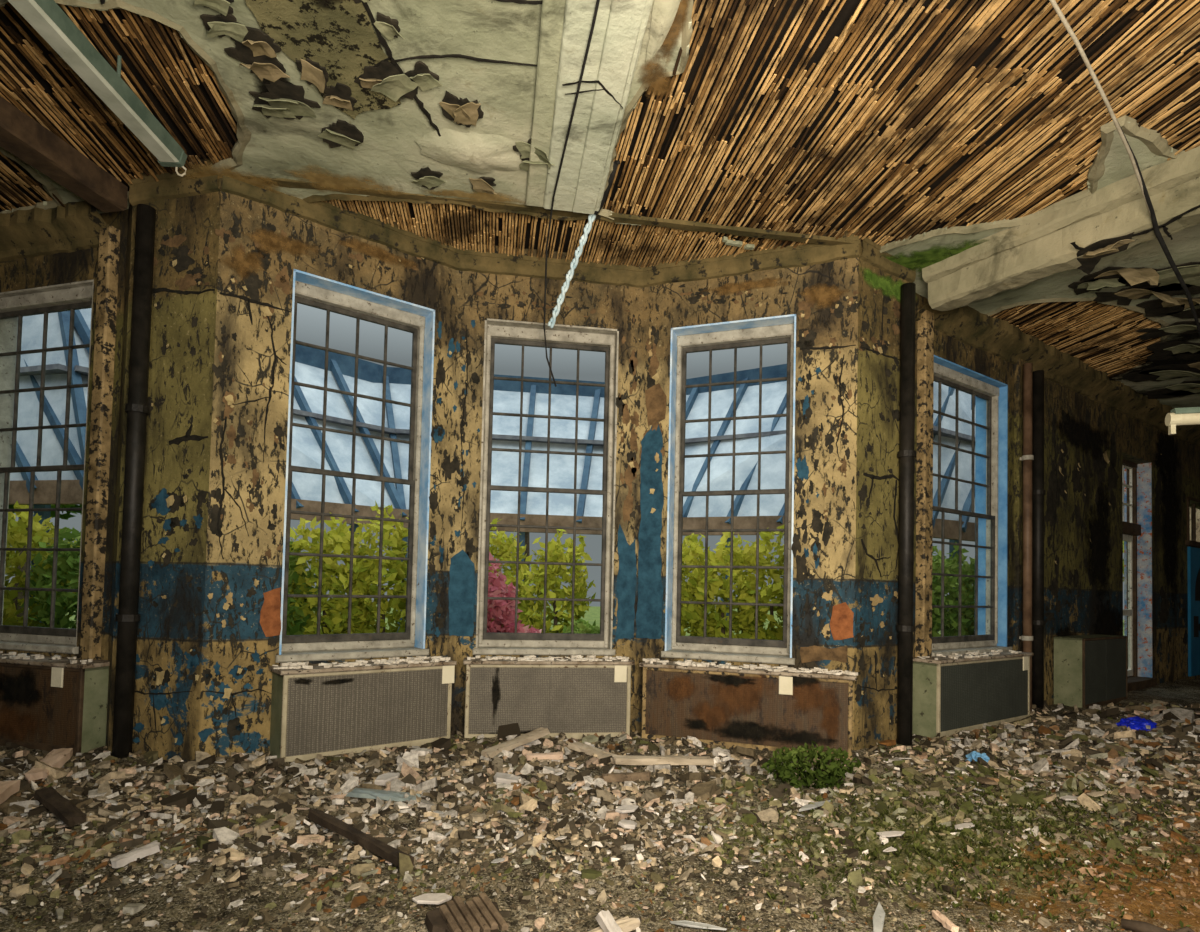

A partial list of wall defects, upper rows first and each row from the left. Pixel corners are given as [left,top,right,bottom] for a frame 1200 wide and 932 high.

flaking render [0,0,484,199]
crack [362,1,537,137]
crack [496,0,542,8]
crack [562,80,623,109]
flaking render [303,0,1200,269]
flaking render [987,232,1200,399]
peeling [142,352,282,567]
peeling [615,310,667,639]
peeling [782,281,900,584]
rust [696,678,761,728]
rust [794,683,839,737]
flaking render [794,575,898,725]